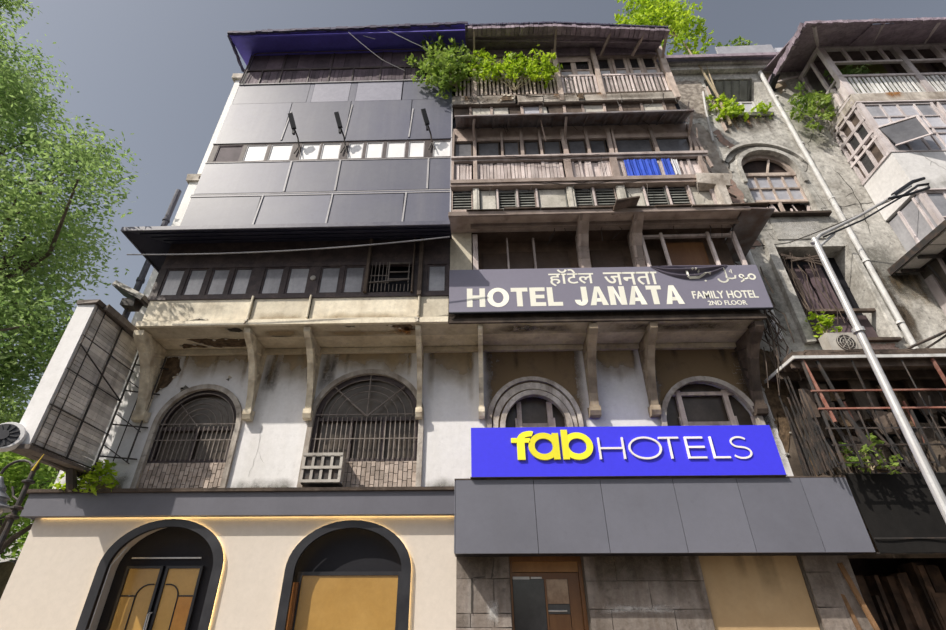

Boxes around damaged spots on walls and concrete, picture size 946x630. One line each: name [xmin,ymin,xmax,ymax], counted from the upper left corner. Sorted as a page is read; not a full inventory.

spalling [155,345,188,397]